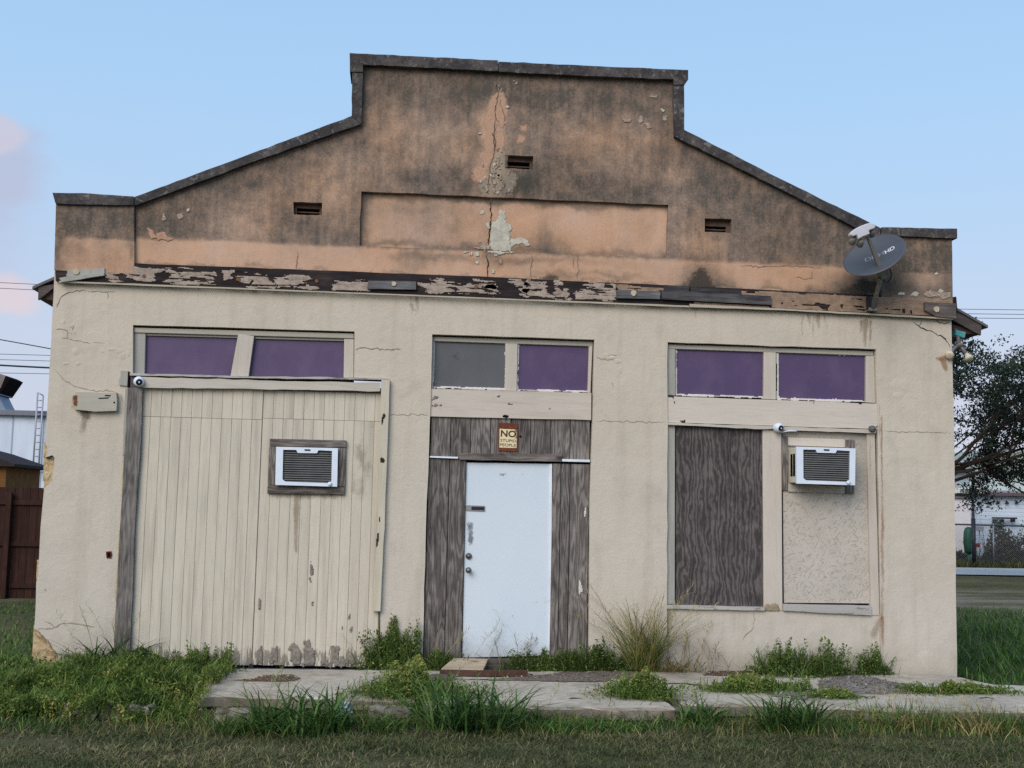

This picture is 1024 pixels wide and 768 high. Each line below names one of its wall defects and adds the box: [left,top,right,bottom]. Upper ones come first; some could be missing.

peeling [471,77,527,194]
crack [486,84,505,277]
peeling [147,208,190,241]
peeling [417,210,664,302]
peeling [105,267,319,290]
peeling [332,279,371,292]
damp [689,269,715,287]
peeling [694,289,953,316]
flaking render [43,442,54,488]
flaking render [32,625,58,664]
peeling [256,639,360,669]